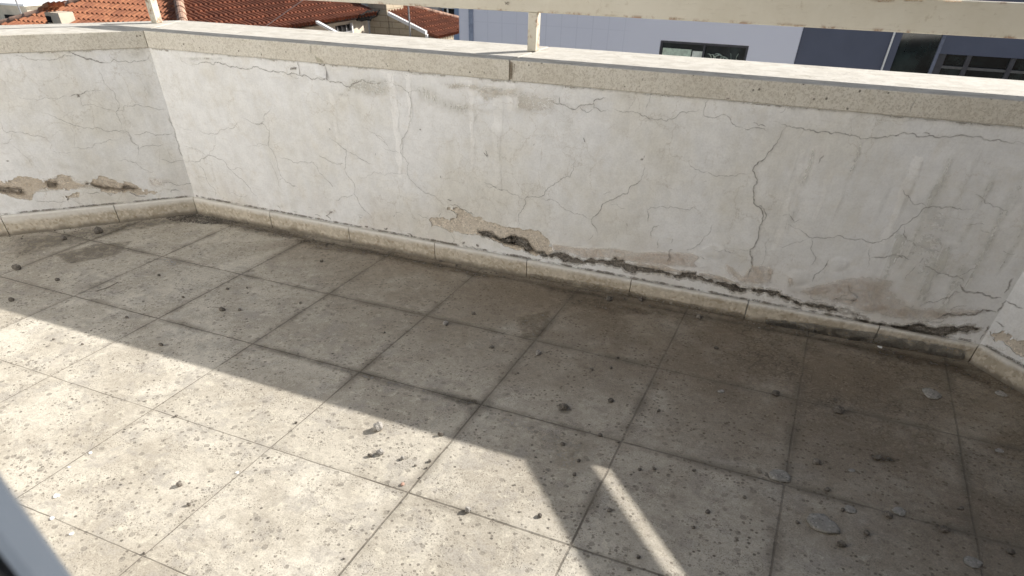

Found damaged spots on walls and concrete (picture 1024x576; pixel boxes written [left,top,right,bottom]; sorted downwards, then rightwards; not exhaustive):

flaking render [0,174,158,201]
flaking render [429,207,1024,357]
crack [944,274,1019,337]